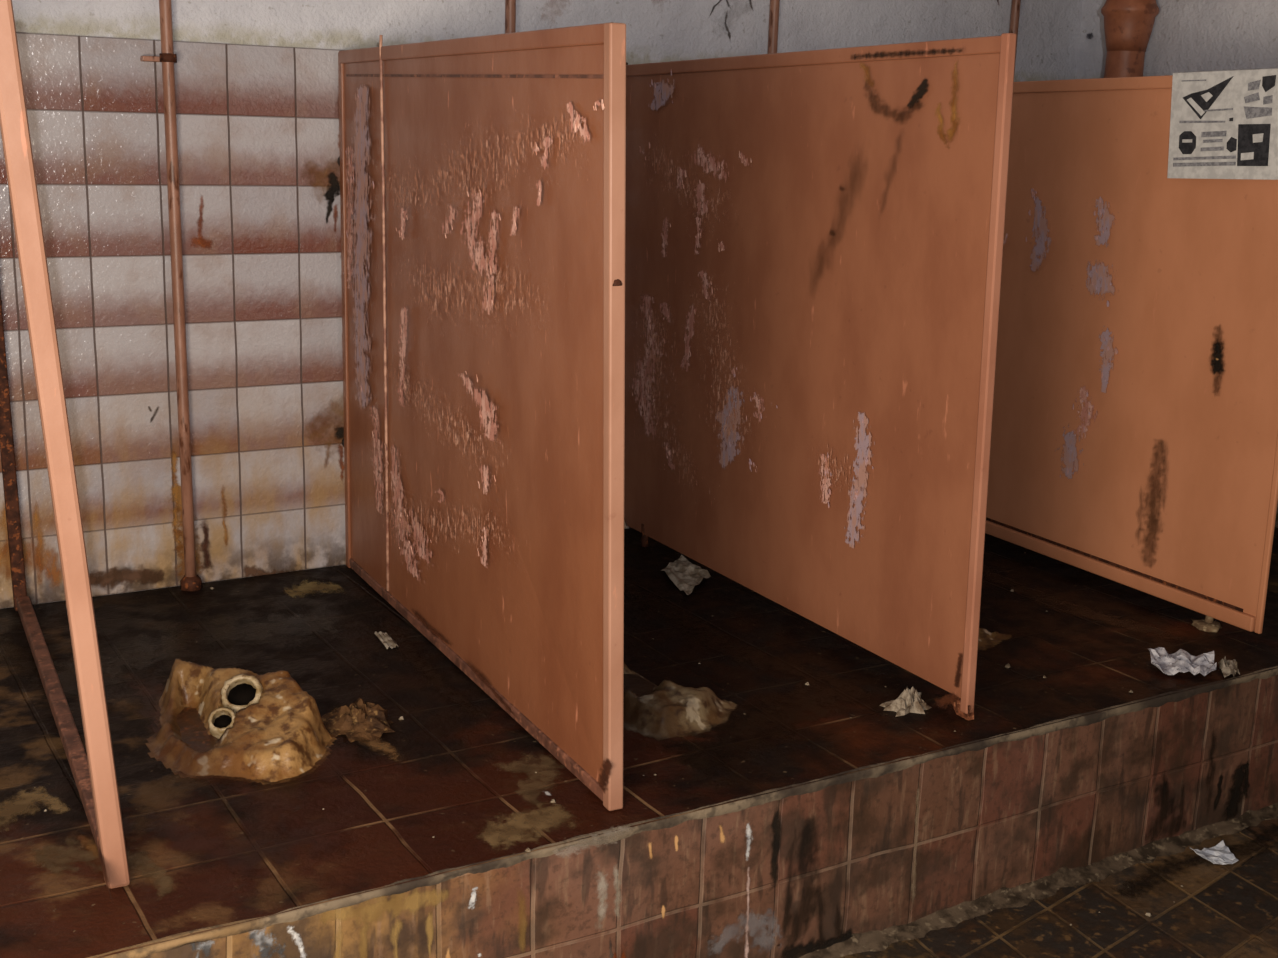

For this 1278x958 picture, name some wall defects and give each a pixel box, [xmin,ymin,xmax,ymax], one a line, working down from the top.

peeling [648,70,675,111]
peeling [637,133,752,257]
peeling [1026,188,1052,271]
peeling [1086,196,1116,307]
peeling [625,270,777,503]
peeling [1055,326,1118,479]
peeling [811,412,875,549]
water stain [53,662,78,698]
water stain [100,614,342,736]
water stain [383,628,471,711]
water stain [770,811,791,930]